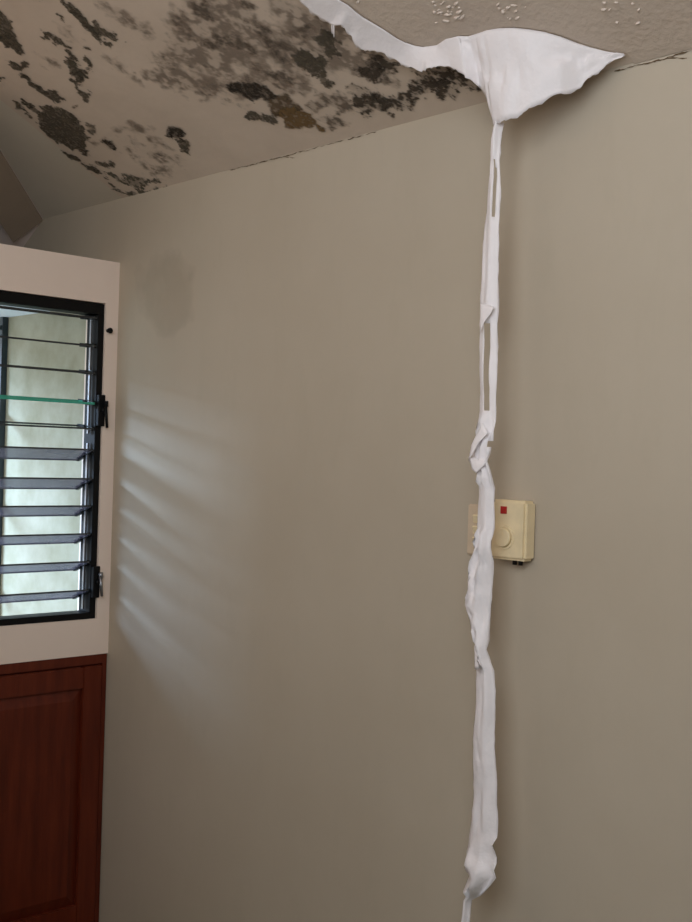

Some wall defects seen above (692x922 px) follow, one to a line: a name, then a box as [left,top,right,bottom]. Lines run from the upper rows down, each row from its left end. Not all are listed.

damp [146,0,481,130]
damp [166,126,190,155]
peeling [299,0,625,922]